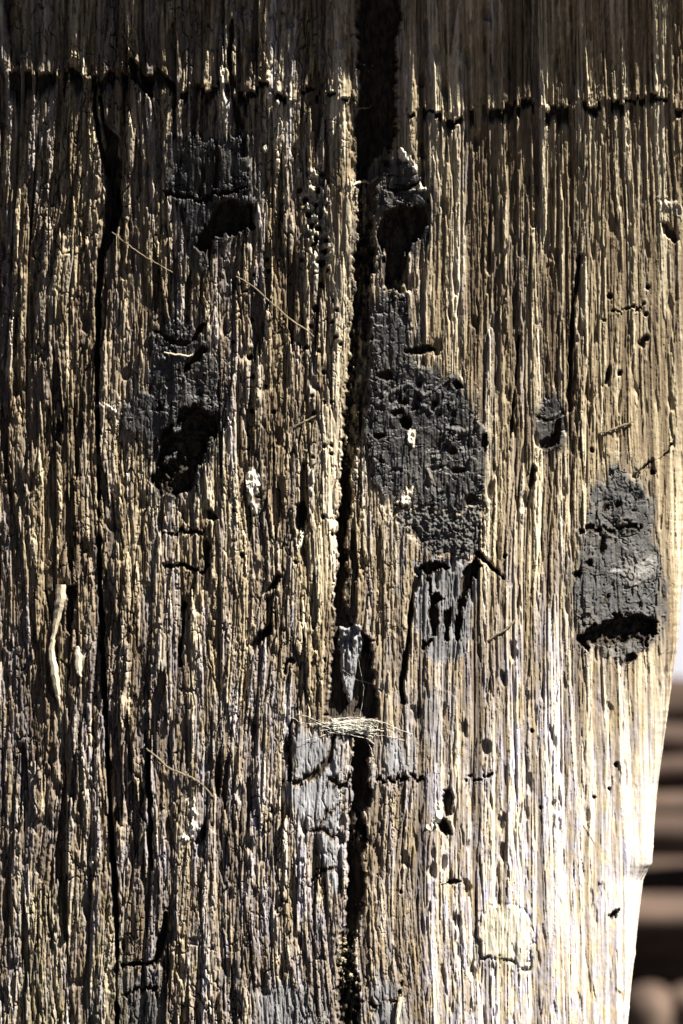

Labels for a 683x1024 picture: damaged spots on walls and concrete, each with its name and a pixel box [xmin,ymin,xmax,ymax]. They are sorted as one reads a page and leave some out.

spalling [404,344,437,355]
spalling [376,369,393,382]
peeling [171,419,184,437]
peeling [390,397,419,450]
peeling [160,450,179,468]
spalling [446,446,465,474]
crack [0,18,287,1024]
crack [281,0,683,1024]
spalling [602,499,623,513]
spalling [572,535,607,580]
spalling [624,652,637,664]